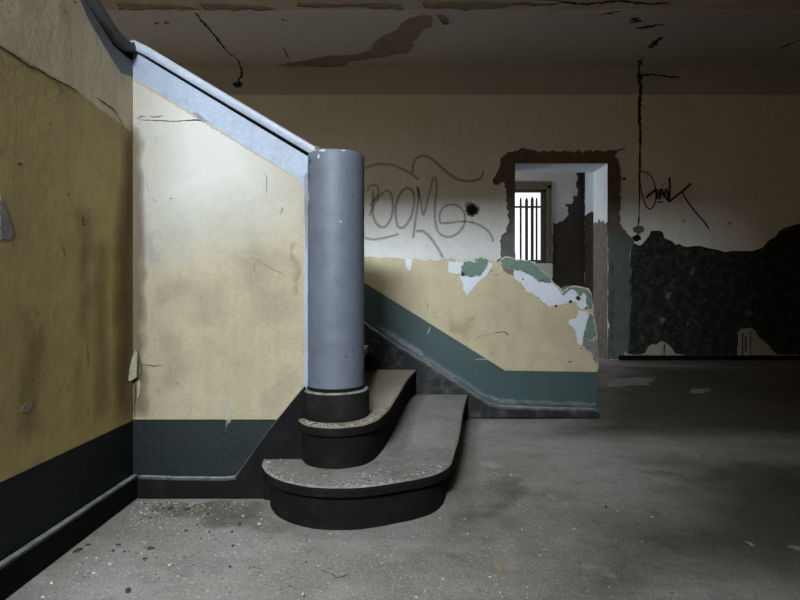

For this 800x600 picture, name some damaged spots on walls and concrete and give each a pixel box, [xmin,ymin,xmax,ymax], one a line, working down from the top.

crack [0,46,78,92]
crack [195,13,244,88]
peeling [275,0,561,67]
crack [97,98,201,130]
crack [542,0,680,242]
peeling [448,145,800,364]